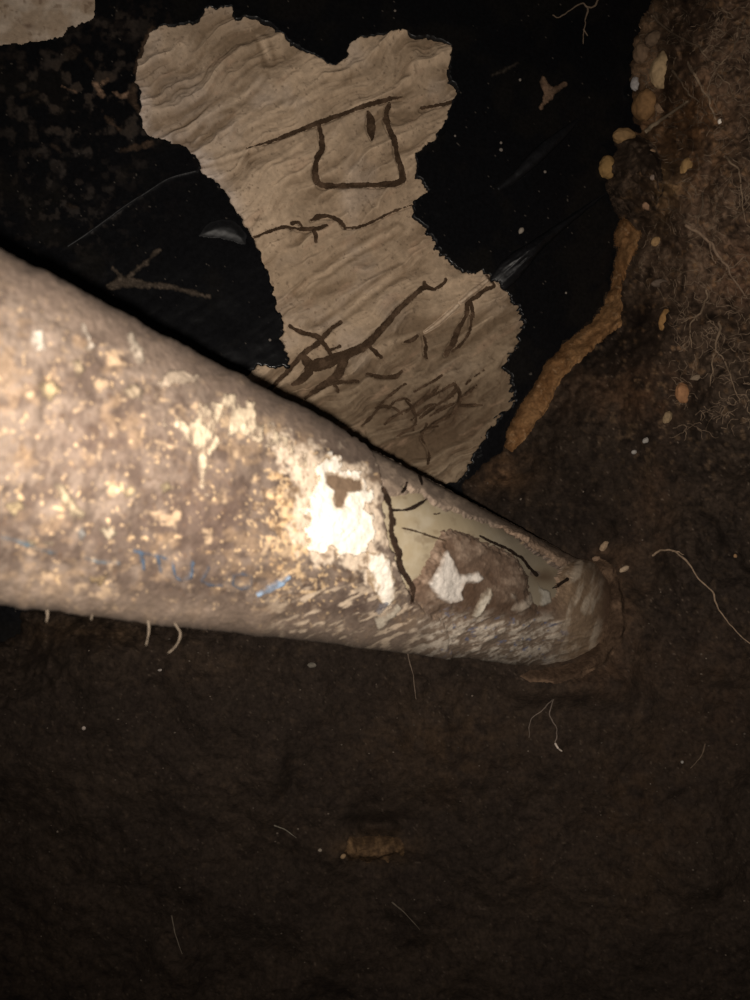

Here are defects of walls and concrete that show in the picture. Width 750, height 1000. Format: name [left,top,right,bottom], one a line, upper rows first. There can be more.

crack [267,275,496,604]
peeling [429,552,493,618]
crack [479,535,569,590]
peeling [512,588,552,614]